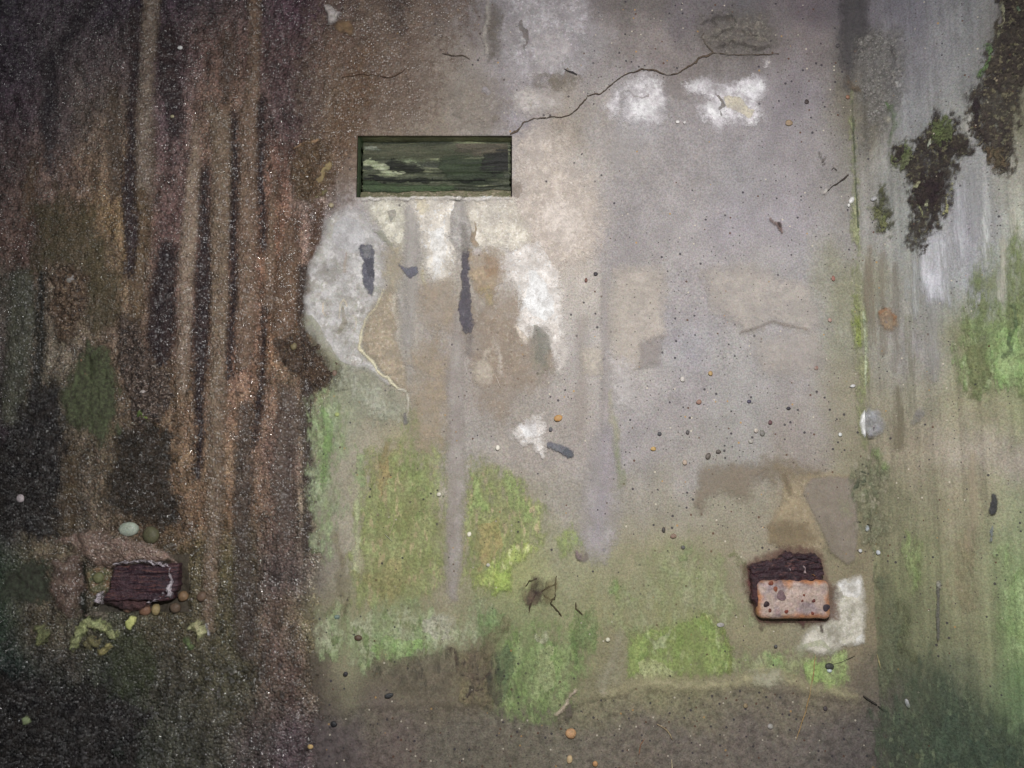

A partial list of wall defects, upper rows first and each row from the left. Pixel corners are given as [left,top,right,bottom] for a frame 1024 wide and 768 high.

crack [510,33,778,134]
damp [605,61,768,127]
damp [960,113,971,140]
flaking render [274,211,415,408]
damp [358,124,599,599]
damp [580,276,619,556]
damp [865,177,1020,358]
rust [745,547,838,632]